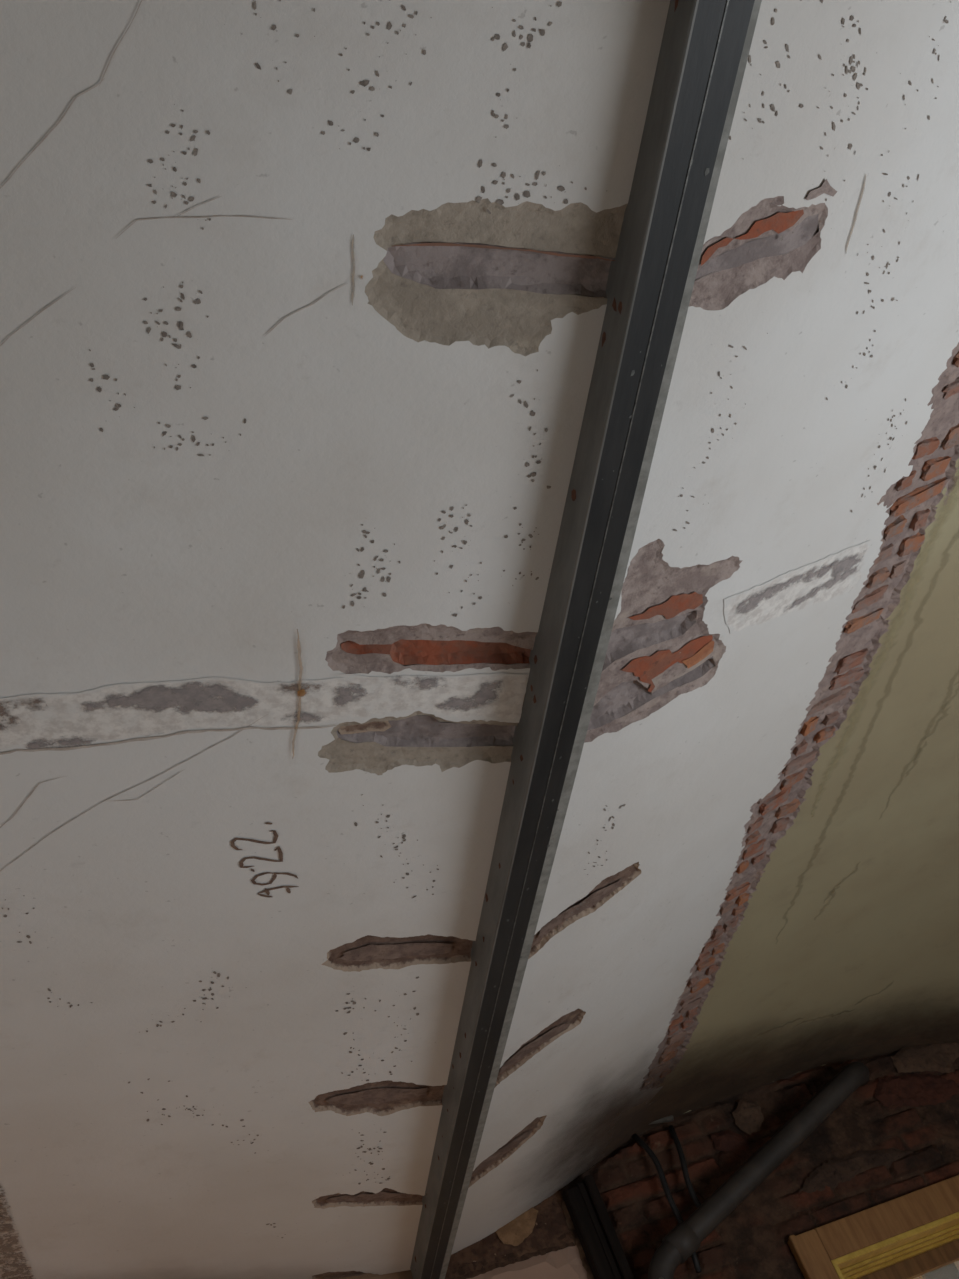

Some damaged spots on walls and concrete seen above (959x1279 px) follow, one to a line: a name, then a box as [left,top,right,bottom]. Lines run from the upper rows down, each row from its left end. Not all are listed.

flaking render [799,16,868,150]
flaking render [365,159,628,357]
flaking render [689,179,845,311]
flaking render [510,380,551,489]
peeling [0,639,531,755]
flaking render [622,635,714,692]
flaking render [629,342,959,1090]
peeling [0,1186,37,1279]